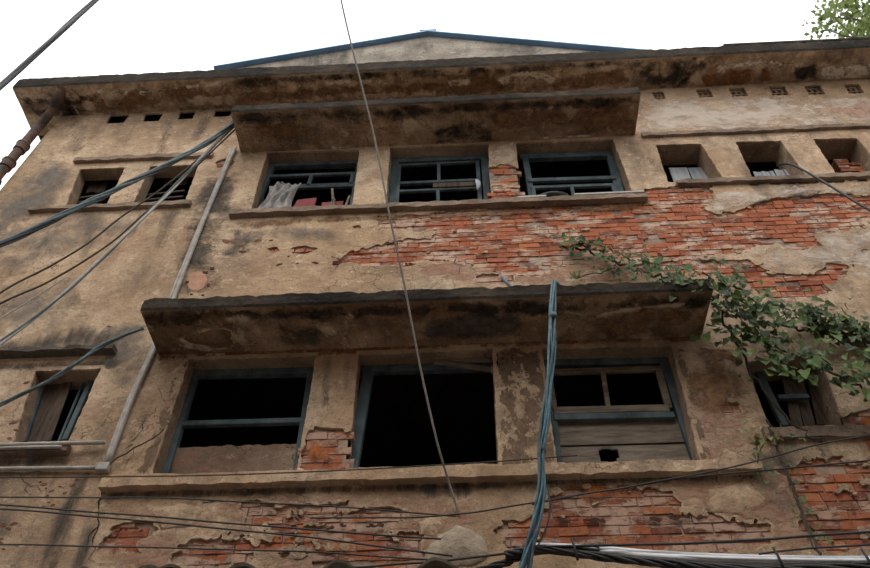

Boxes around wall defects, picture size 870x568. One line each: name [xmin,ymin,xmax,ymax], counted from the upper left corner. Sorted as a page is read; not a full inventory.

leakage [64,84,236,113]
leakage [239,70,634,164]
peeling [642,98,870,131]
leakage [3,167,67,222]
leakage [181,177,233,269]
spalling [333,164,870,302]
leakage [33,305,434,368]
peeling [491,348,554,465]
spalling [295,428,355,470]
crack [88,492,102,562]
spalling [98,486,475,568]
spalling [493,455,870,554]